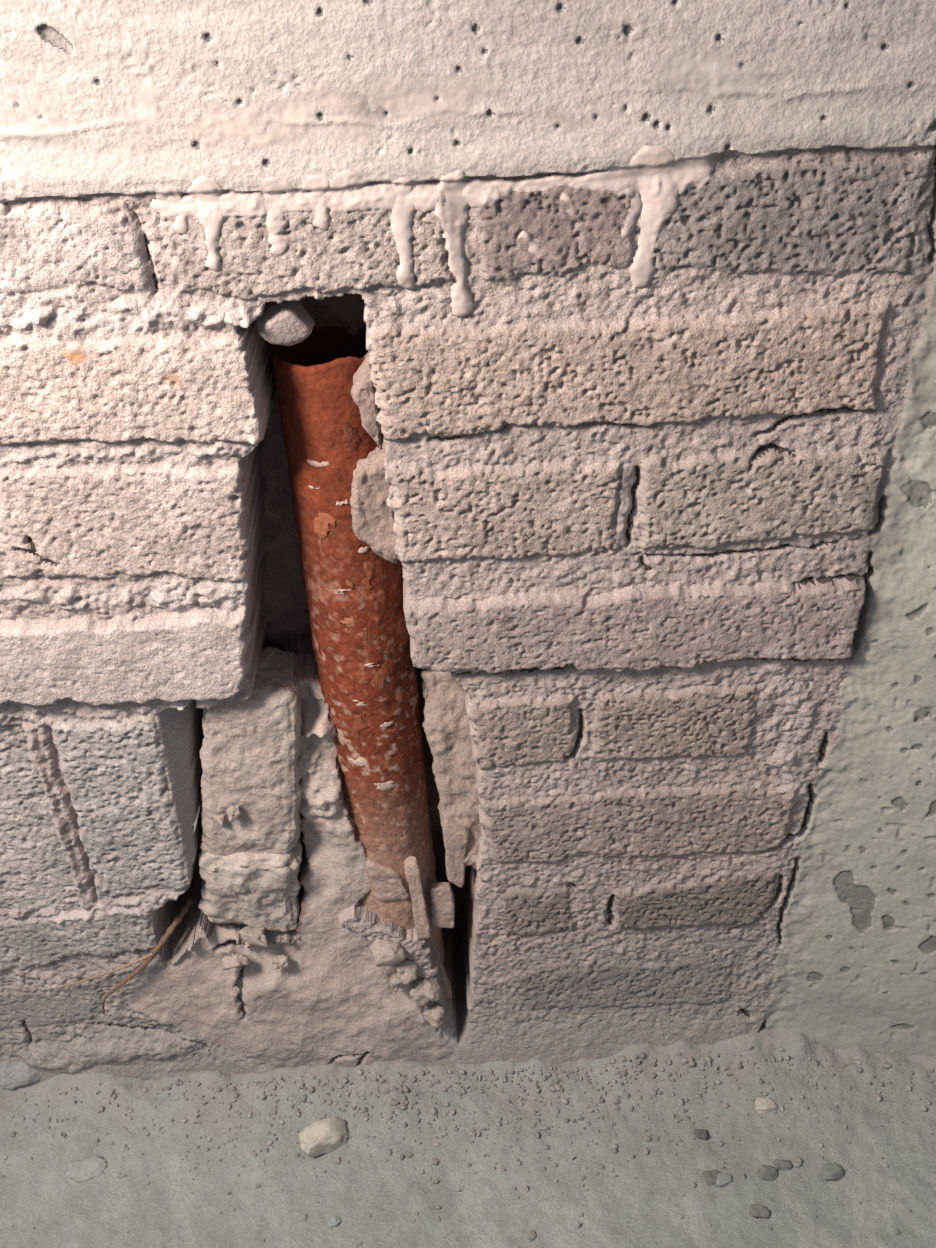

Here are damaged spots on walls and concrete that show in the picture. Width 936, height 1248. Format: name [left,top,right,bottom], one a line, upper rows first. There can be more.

crack [927,145,936,260]
crack [432,424,526,442]
crack [751,406,858,460]
crack [18,536,57,566]
rust [313,512,336,552]
crack [626,466,883,662]
rust [341,616,367,639]
peeling [349,757,368,766]
spalling [198,646,304,933]
peeling [374,781,396,791]
crack [216,940,252,1015]